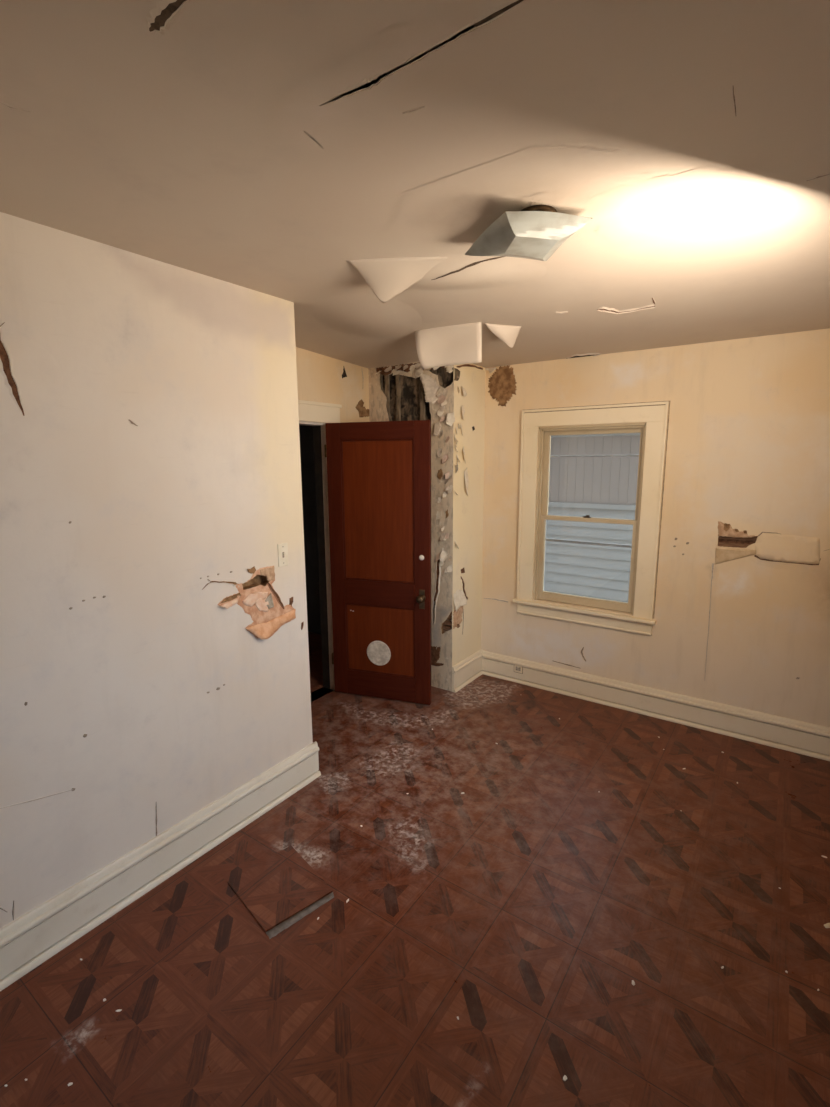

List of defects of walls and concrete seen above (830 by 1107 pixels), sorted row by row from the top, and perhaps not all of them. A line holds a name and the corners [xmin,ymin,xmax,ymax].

spalling [356,399,369,417]
spalling [376,362,517,666]
spalling [200,566,304,640]
spalling [704,521,821,681]